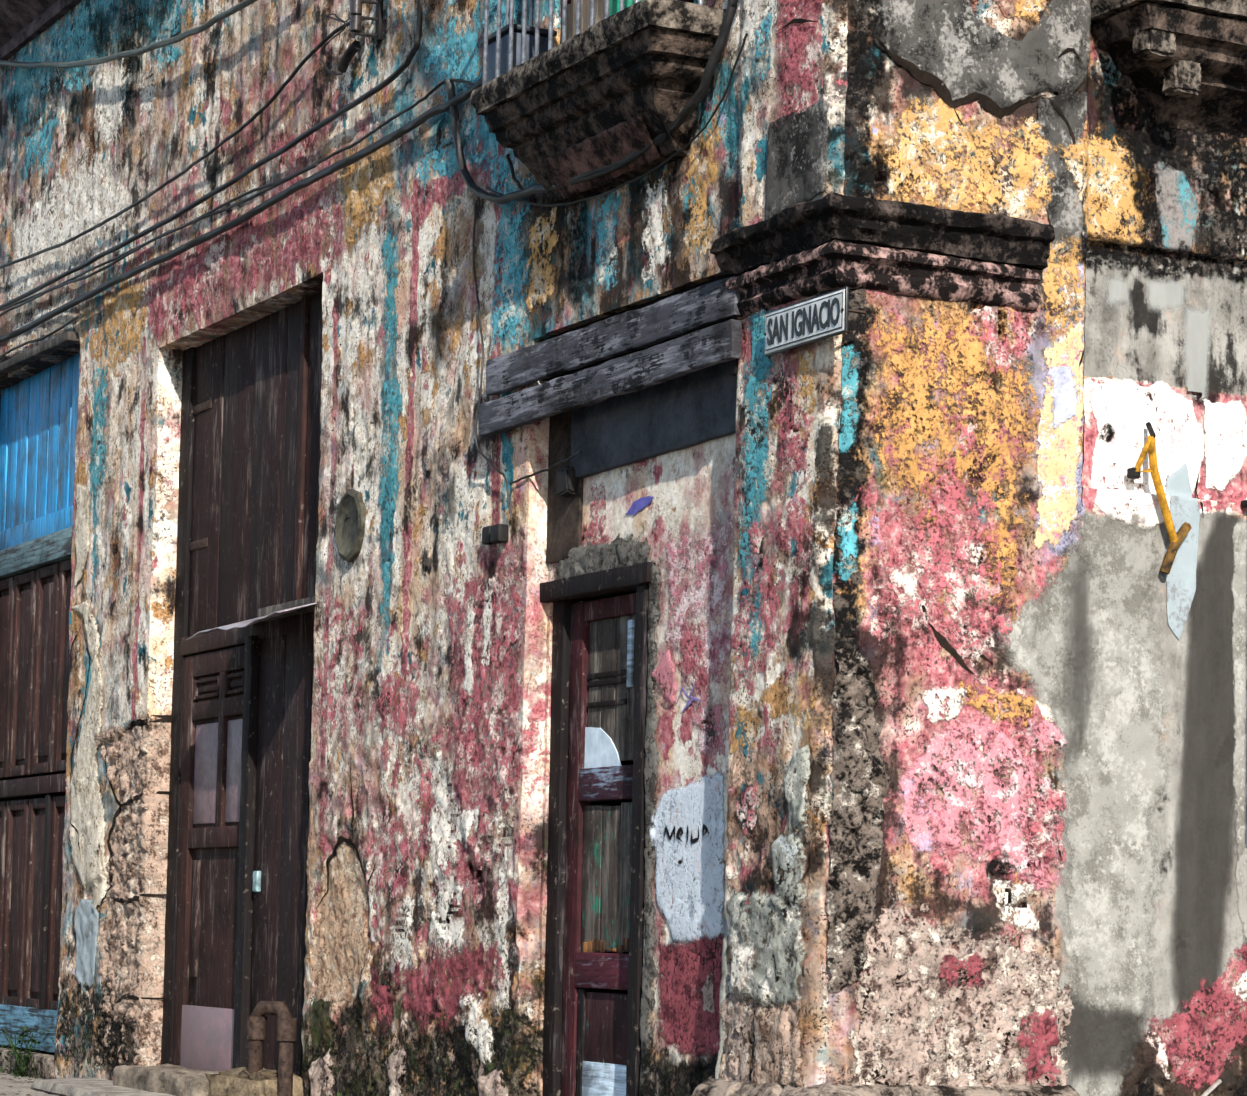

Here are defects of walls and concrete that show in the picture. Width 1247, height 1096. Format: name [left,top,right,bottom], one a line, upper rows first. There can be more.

damp [1081,20,1247,398]
crack [68,593,91,778]
flaking render [69,600,171,1072]
crack [69,715,173,911]
crack [113,994,164,1006]
peeling [74,218,229,587]
crack [316,766,376,909]
damp [301,987,544,1096]
flaking render [309,376,550,1096]
damp [833,288,875,658]
peeling [786,97,1247,1090]
damp [1058,1000,1141,1079]